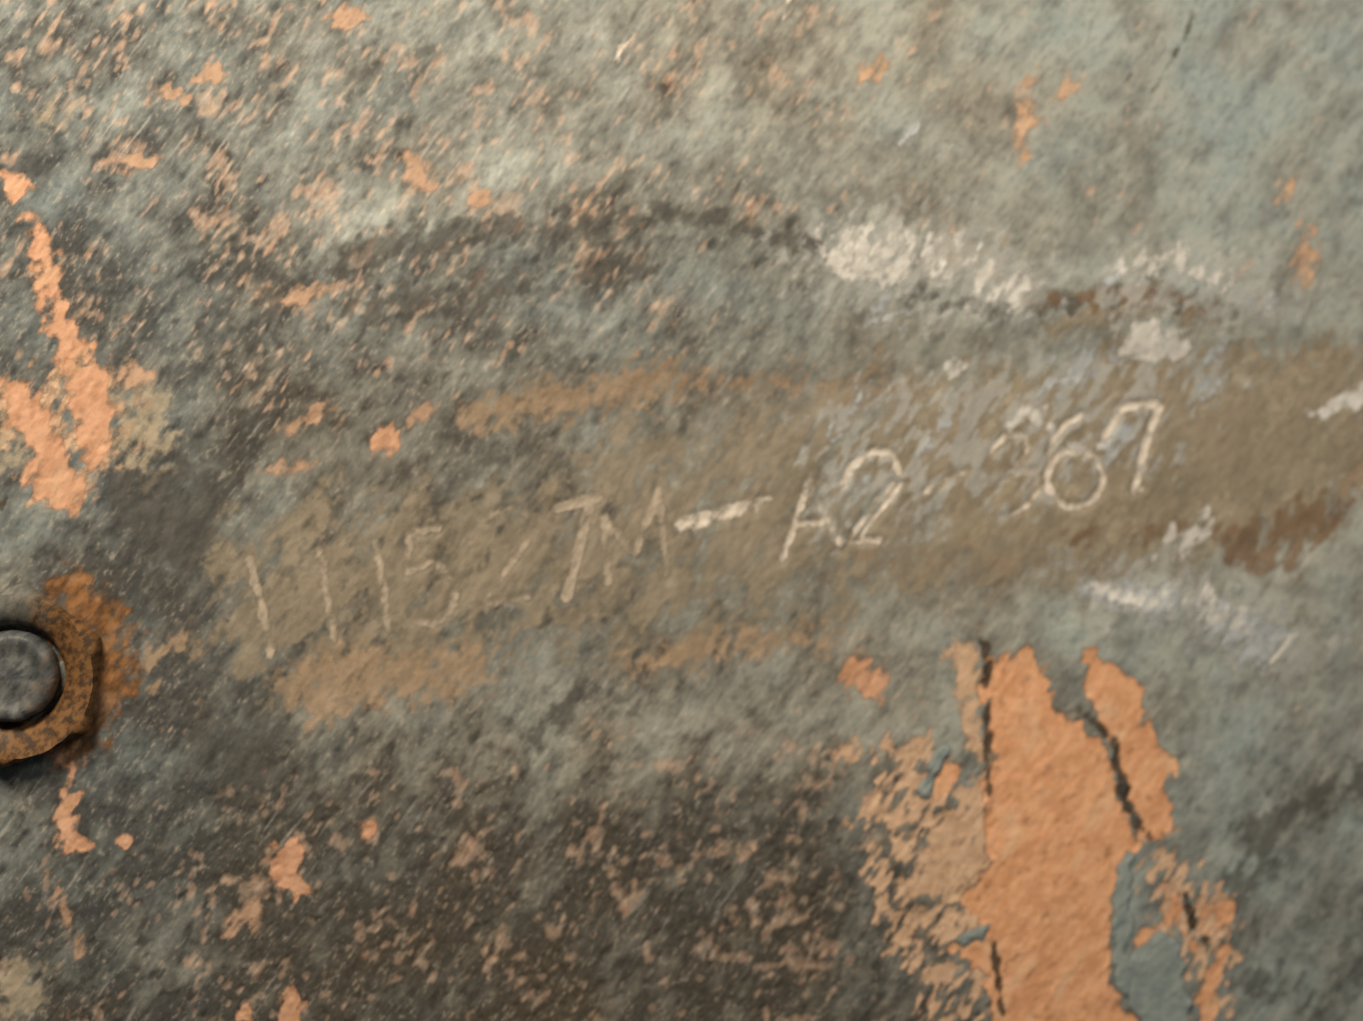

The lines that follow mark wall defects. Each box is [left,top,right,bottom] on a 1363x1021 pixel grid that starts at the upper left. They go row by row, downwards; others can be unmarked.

peeling [0,170,156,517]
rust [43,568,187,786]
peeling [831,642,1244,1021]